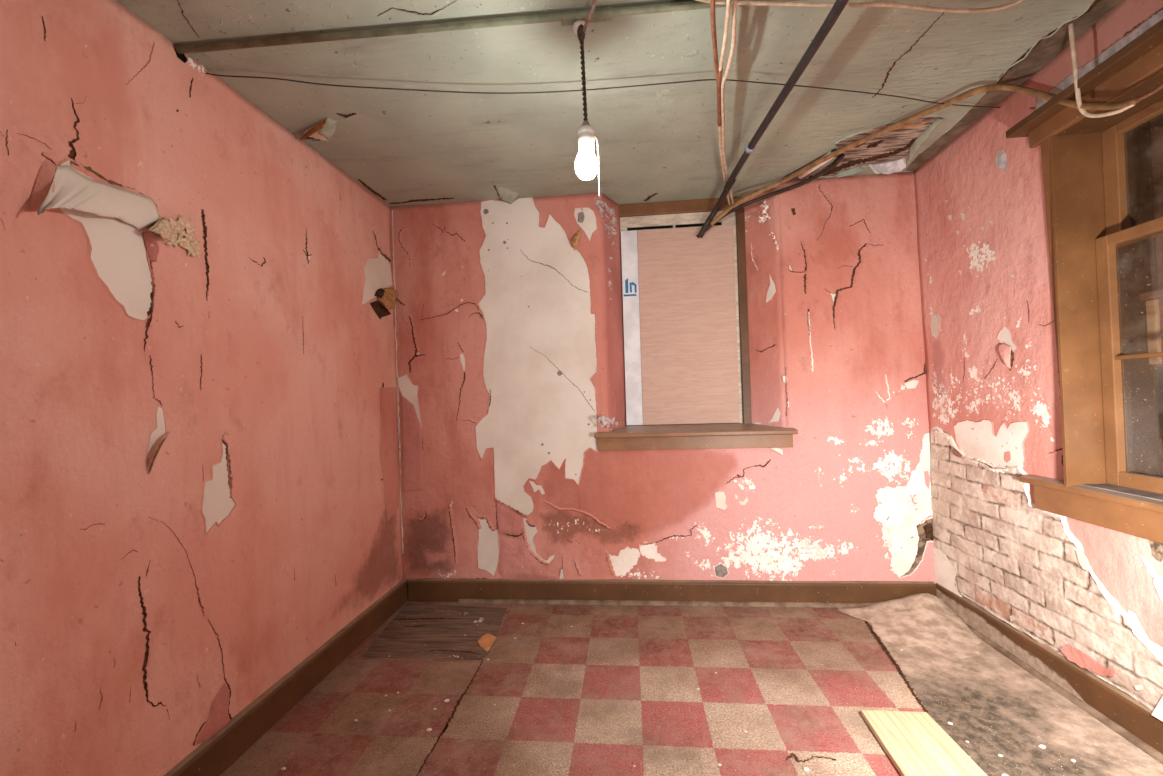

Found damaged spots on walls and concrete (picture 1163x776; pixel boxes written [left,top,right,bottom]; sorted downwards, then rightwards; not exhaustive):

crack [6,96,87,166]
crack [378,0,457,18]
crack [872,12,944,98]
peeling [28,157,200,352]
crack [751,184,882,416]
peeling [448,185,621,579]
peeling [200,432,236,535]
peeling [685,477,858,581]
flaking render [815,318,1163,711]
crack [138,562,170,720]
crack [149,517,232,720]
peeling [864,620,1163,776]